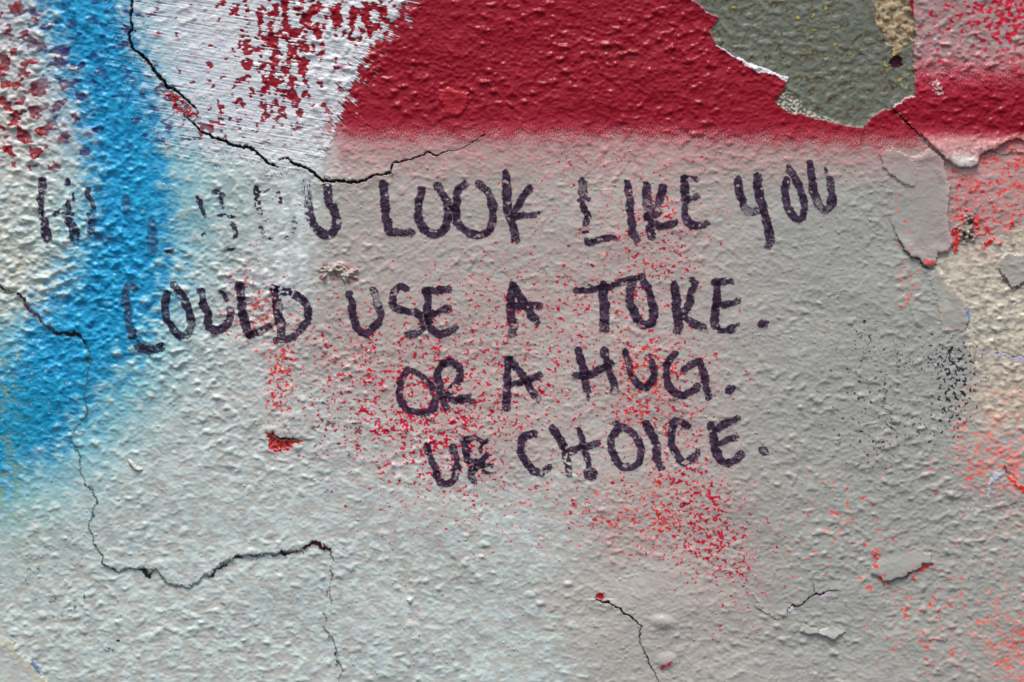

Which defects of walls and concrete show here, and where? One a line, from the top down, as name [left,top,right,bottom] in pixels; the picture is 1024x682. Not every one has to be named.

crack [126,0,487,186]
peeling [690,0,917,129]
peeling [876,130,1024,290]
crack [69,341,107,567]
crack [322,551,344,682]
crack [606,600,661,682]
crack [752,581,839,622]
peeling [871,548,935,586]